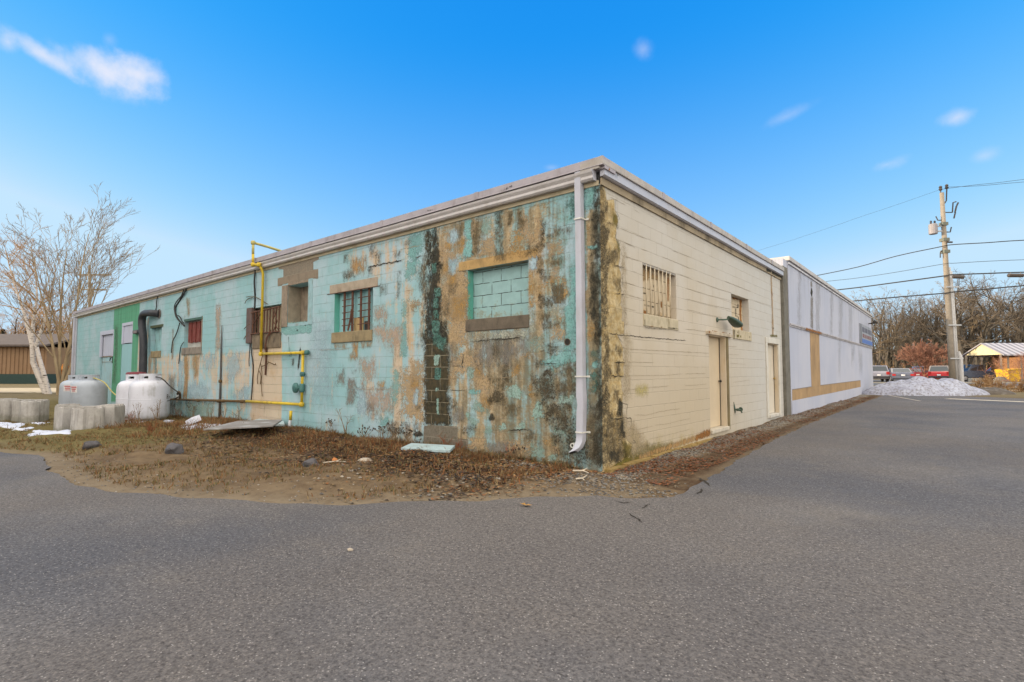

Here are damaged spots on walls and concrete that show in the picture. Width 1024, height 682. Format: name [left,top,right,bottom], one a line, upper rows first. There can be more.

peeling [175,360,214,417]
peeling [356,300,426,426]
peeling [404,232,424,282]
water stain [387,211,524,451]
water stain [470,223,570,420]
flaking render [439,186,632,471]
water stain [532,187,608,466]